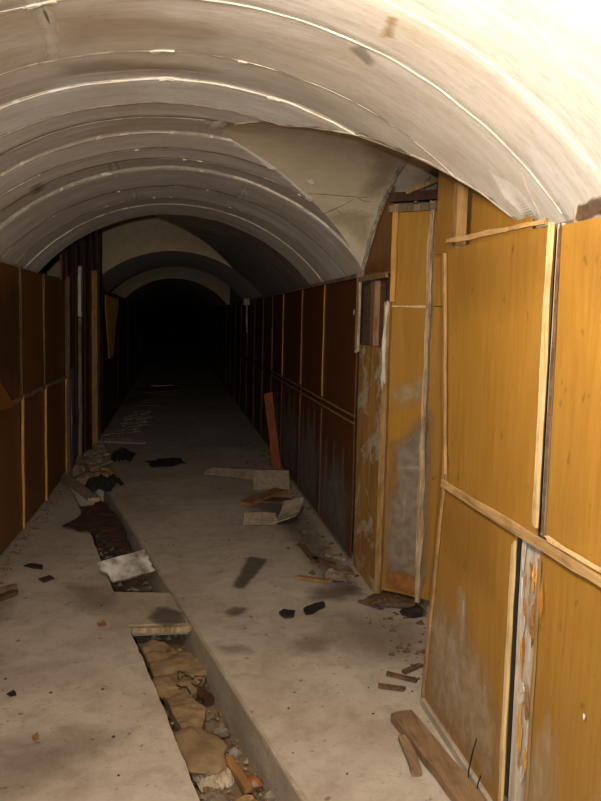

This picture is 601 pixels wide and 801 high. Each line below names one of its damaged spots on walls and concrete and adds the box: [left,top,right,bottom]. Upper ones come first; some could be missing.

damp [387,425,428,580]
damp [431,597,492,768]